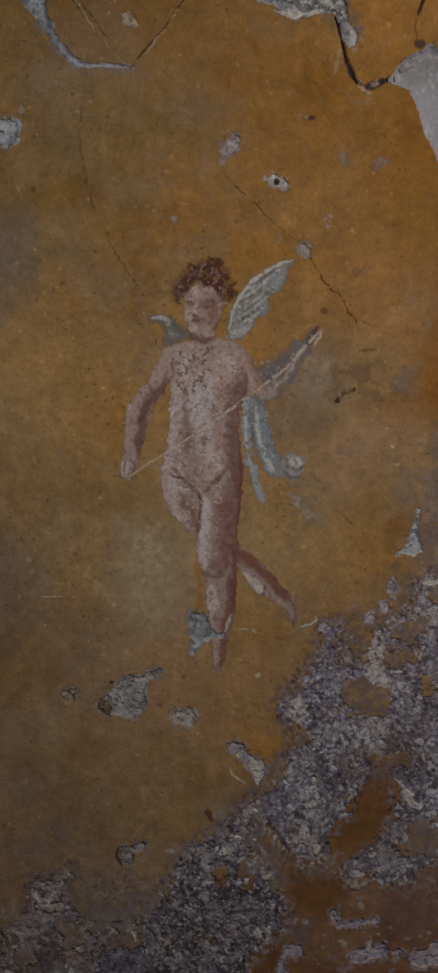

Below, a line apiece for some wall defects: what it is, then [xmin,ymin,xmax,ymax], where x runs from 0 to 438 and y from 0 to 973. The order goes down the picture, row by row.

spalling [21,0,132,72]
flaking render [111,0,138,29]
crack [74,0,184,75]
spalling [255,0,363,48]
crack [331,9,395,96]
crack [415,0,425,48]
spalling [0,106,23,148]
peeling [388,43,438,162]
spalling [0,508,438,973]